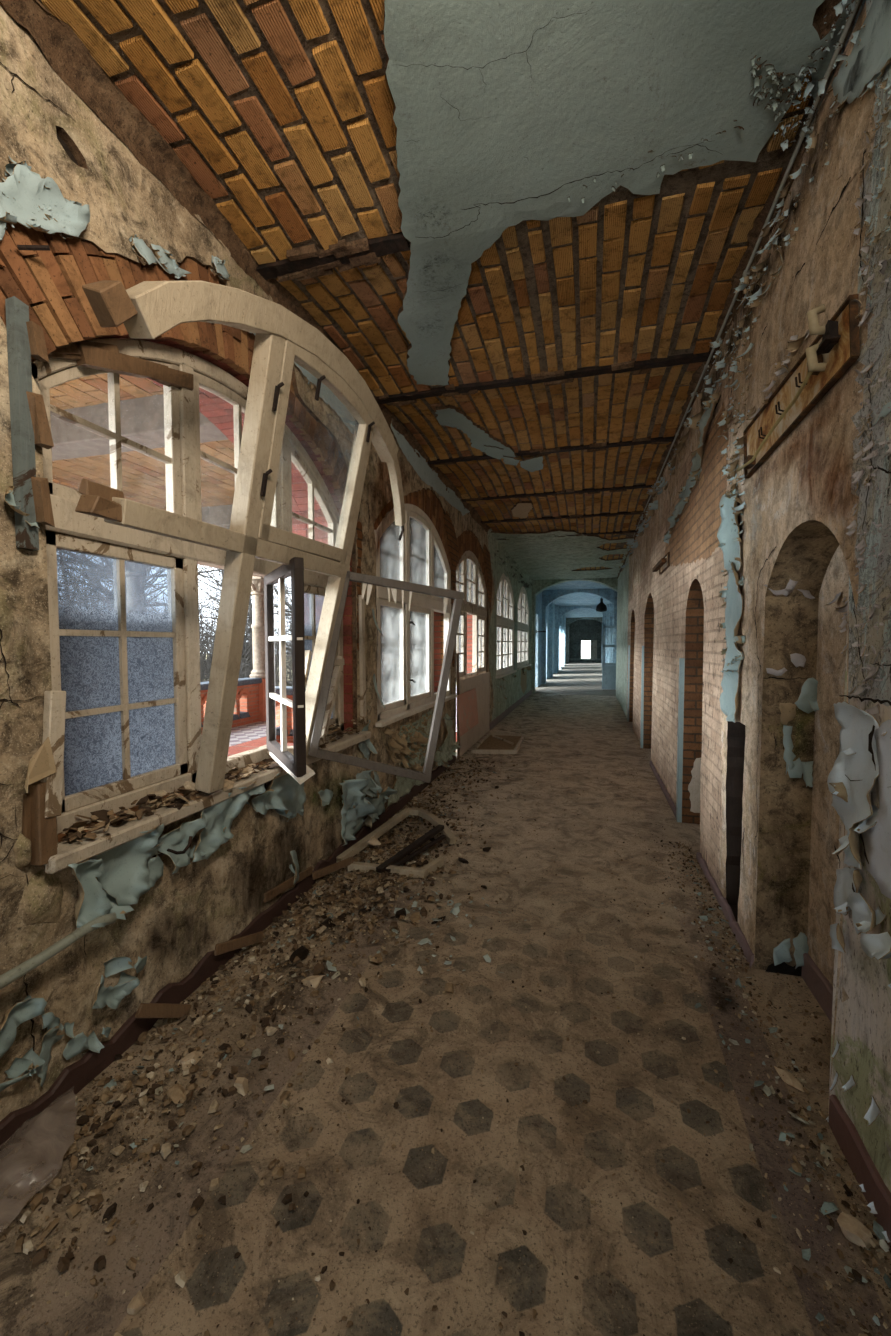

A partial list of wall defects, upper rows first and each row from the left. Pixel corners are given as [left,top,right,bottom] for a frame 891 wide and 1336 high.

peeling [0,155,90,241]
peeling [484,445,543,472]
peeling [619,0,891,960]
crack [0,629,39,708]
crack [0,783,29,886]
peeling [68,709,461,928]
peeling [91,955,147,1009]
peeling [765,932,809,977]
peeling [0,995,111,1092]
peeling [830,1041,856,1092]
peeling [864,1096,882,1126]